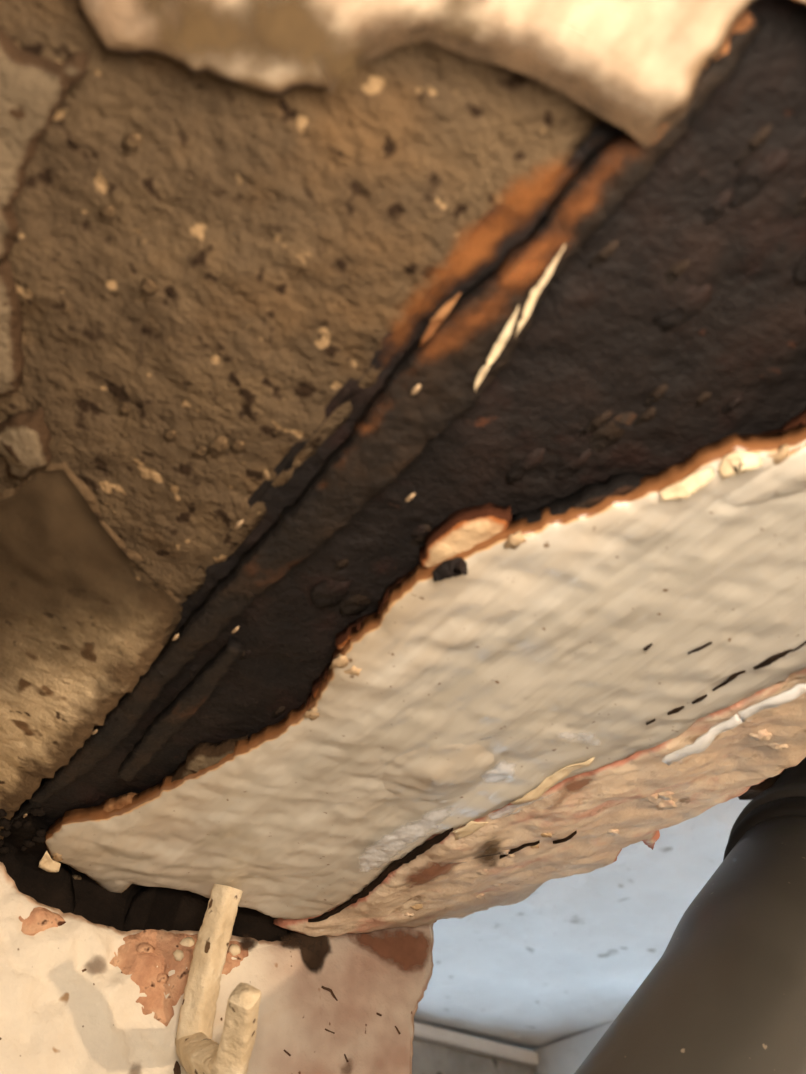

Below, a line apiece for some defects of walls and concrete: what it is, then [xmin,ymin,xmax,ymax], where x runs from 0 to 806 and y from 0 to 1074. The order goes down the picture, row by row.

rust [442,168,557,278]
rust [567,169,610,218]
flaking render [0,0,604,604]
rust [426,234,566,356]
peeling [659,451,763,501]
crack [646,641,806,725]
flaking render [273,668,806,937]
peeling [38,851,61,872]
flaking render [19,907,66,936]
flaking render [110,929,198,1027]
flaking render [222,941,249,975]